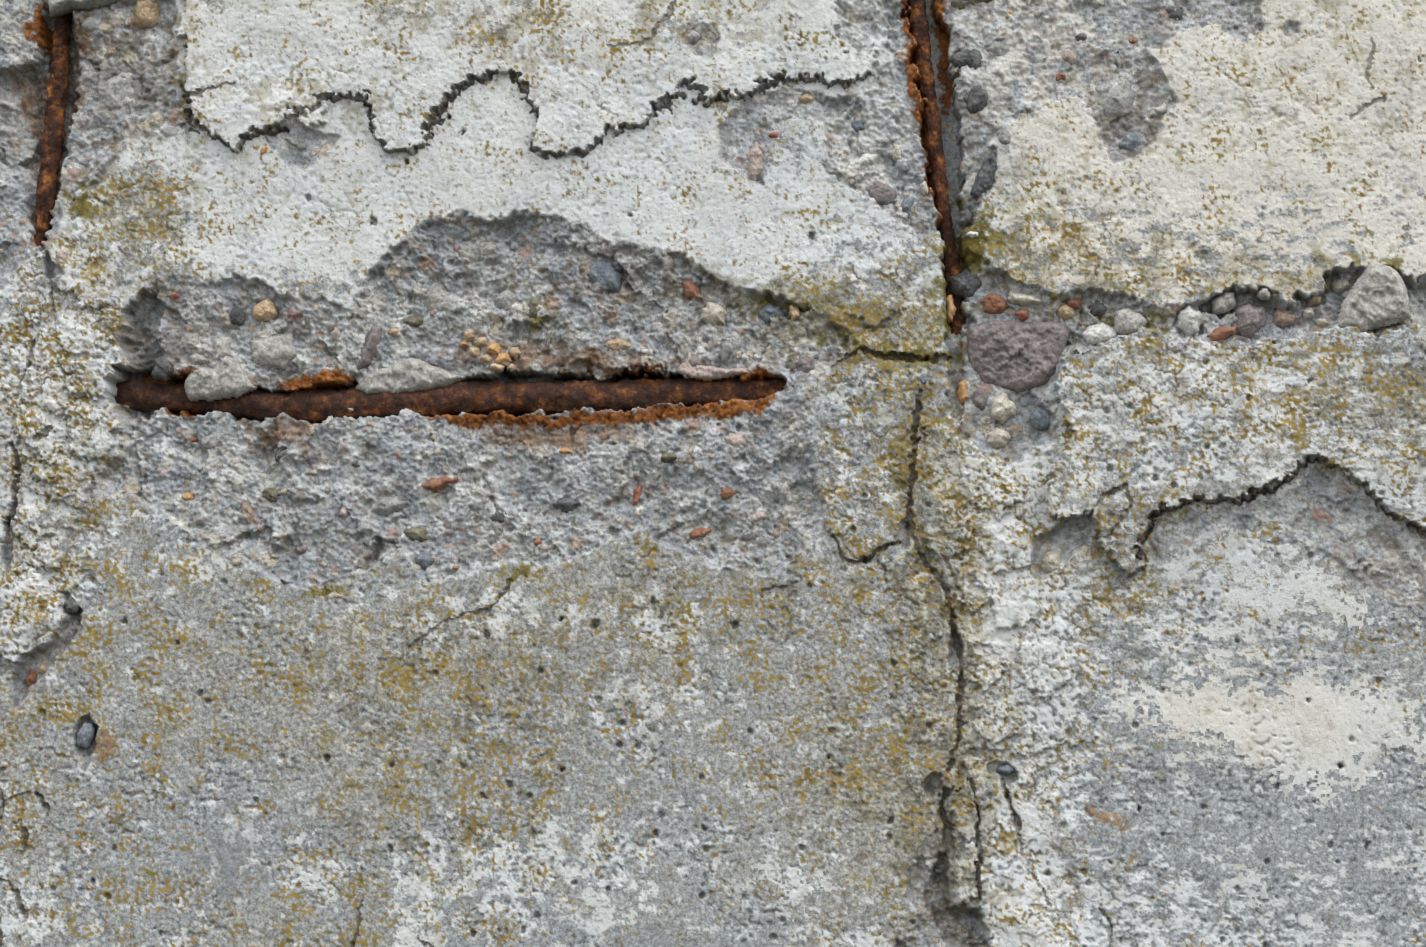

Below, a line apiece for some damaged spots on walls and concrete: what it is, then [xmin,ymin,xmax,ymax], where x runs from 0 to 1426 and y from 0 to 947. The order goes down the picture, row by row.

corrosion [25,0,53,58]
crack [180,69,875,160]
corrosion [899,0,955,229]
crack [1348,38,1387,120]
flaking render [0,0,1426,632]
corrosion [278,367,357,393]
corrosion [429,365,787,431]
crack [827,346,973,773]
crack [1094,453,1426,570]
peeling [1108,644,1426,809]
crack [975,776,1052,908]
peeling [1221,864,1272,909]